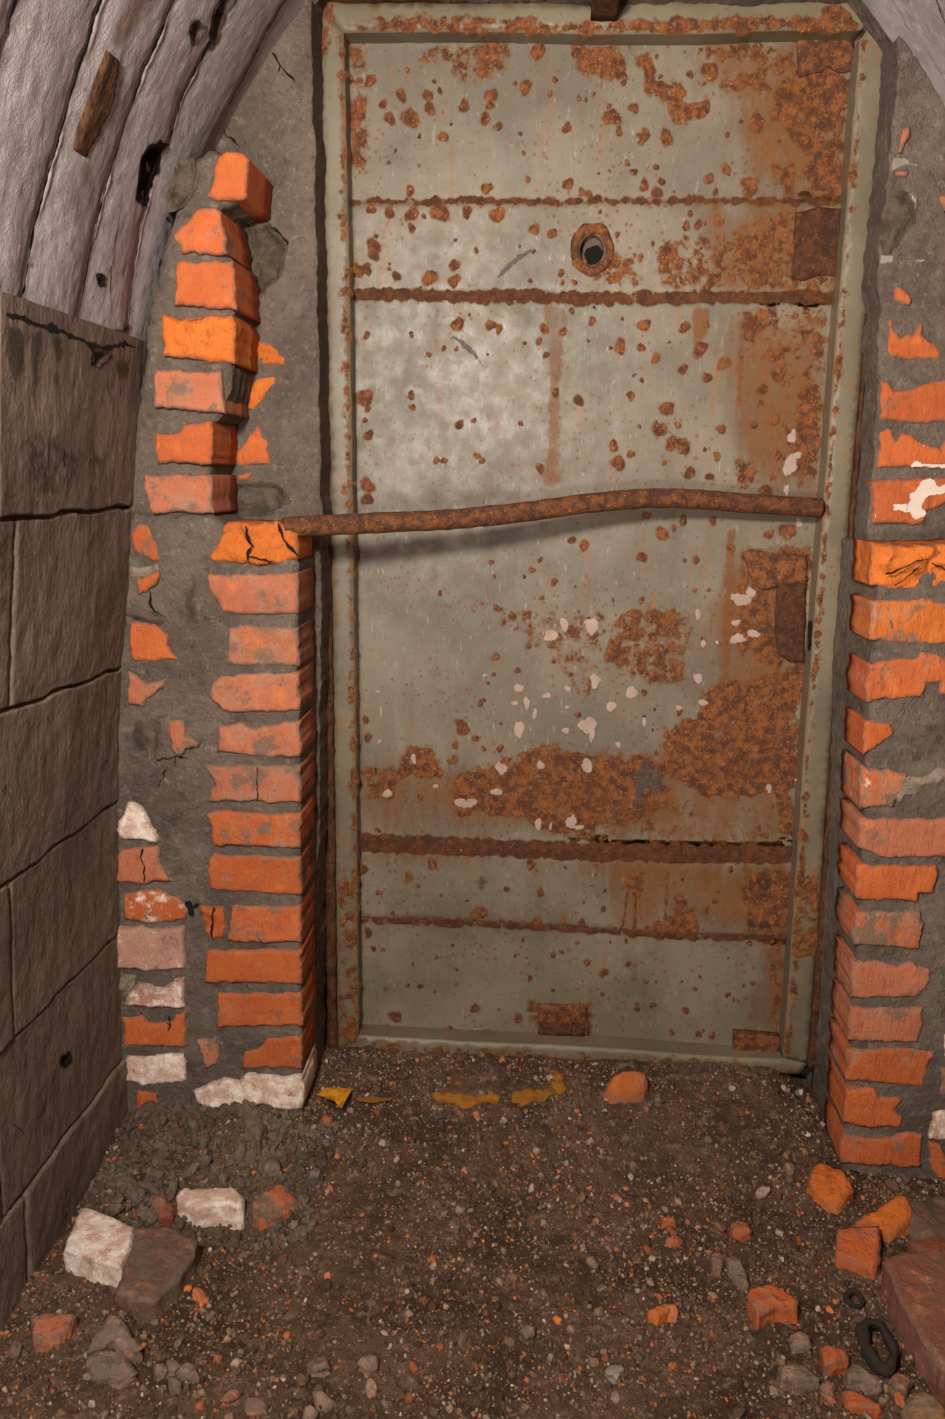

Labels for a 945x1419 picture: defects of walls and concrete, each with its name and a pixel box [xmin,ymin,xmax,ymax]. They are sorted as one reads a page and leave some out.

crack [223,0,295,147]
crack [6,0,224,353]
spalling [136,140,200,218]
spalling [245,223,288,298]
crack [266,224,289,245]
spalling [234,479,291,517]
crack [245,523,297,563]
corrosion [282,4,868,1073]
crack [885,559,945,586]